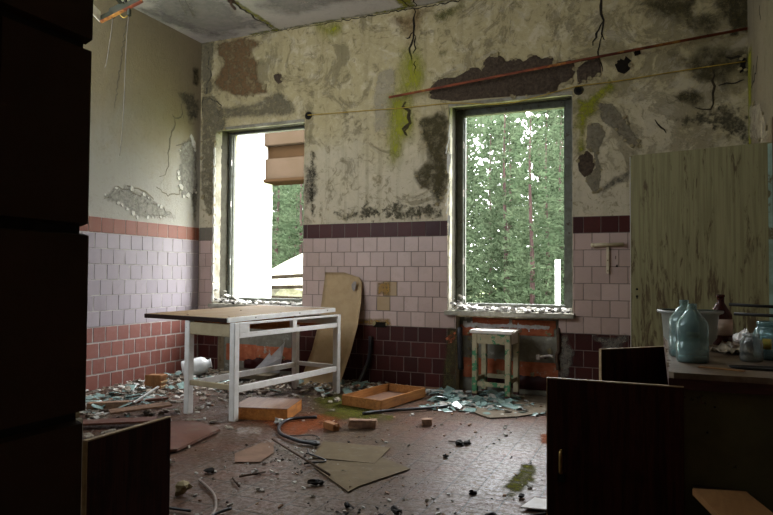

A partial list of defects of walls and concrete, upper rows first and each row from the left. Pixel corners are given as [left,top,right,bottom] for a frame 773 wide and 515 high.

crack [227,0,460,73]
crack [592,0,605,72]
spalling [428,52,601,101]
leakage [681,48,748,86]
mould [676,91,700,104]
mould [676,105,749,143]
flaking render [177,38,283,302]
flaking render [104,185,172,219]
mould [336,202,442,220]